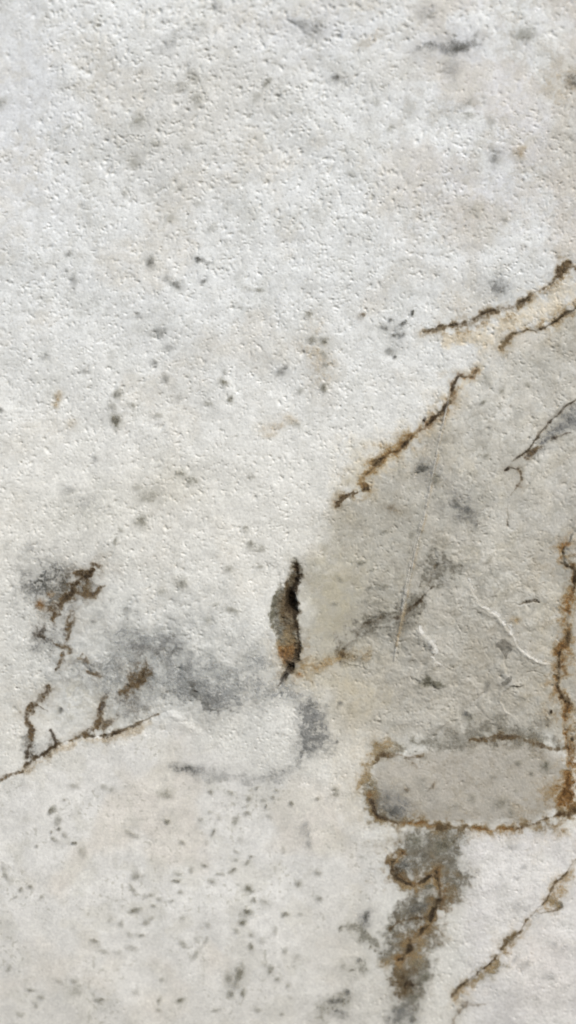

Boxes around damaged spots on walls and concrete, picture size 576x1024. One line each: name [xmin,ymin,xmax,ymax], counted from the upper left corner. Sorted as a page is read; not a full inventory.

crack [424,260,576,351]
crack [335,369,478,507]
crack [504,403,576,488]
damp [22,562,337,757]
spalling [270,559,303,686]
crack [335,549,463,660]
crack [0,684,159,781]
rust [364,542,576,1022]
crack [451,871,574,1013]